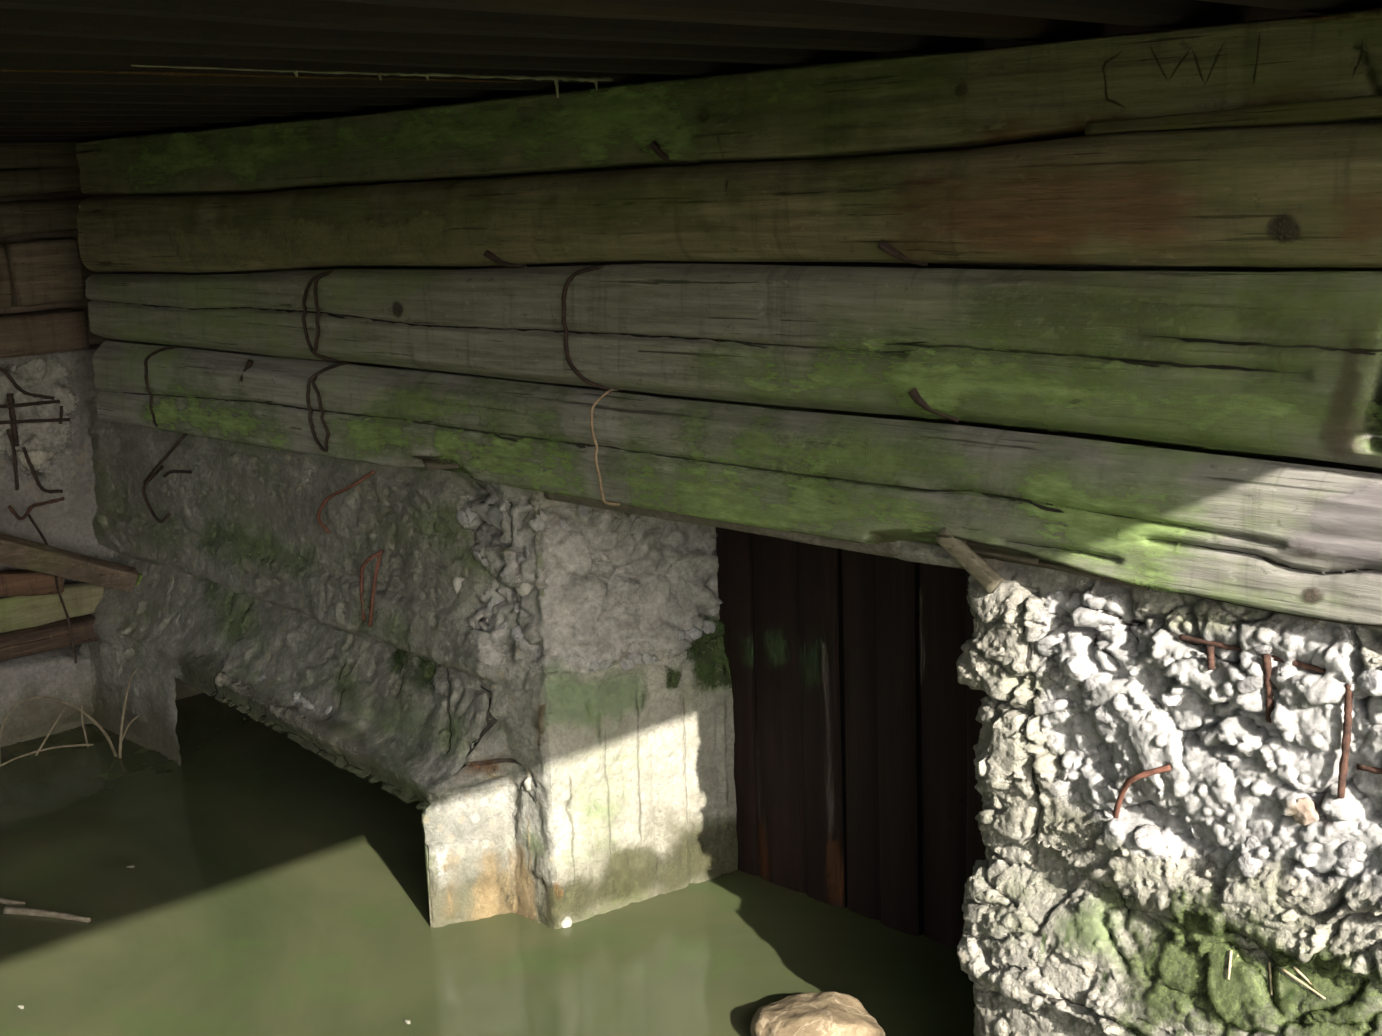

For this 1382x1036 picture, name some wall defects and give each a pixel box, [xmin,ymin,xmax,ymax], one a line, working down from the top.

spalling [413,456,723,673]
crack [447,668,521,768]
spalling [865,529,1382,888]
water stain [547,820,739,921]
corrosion [828,843,844,901]